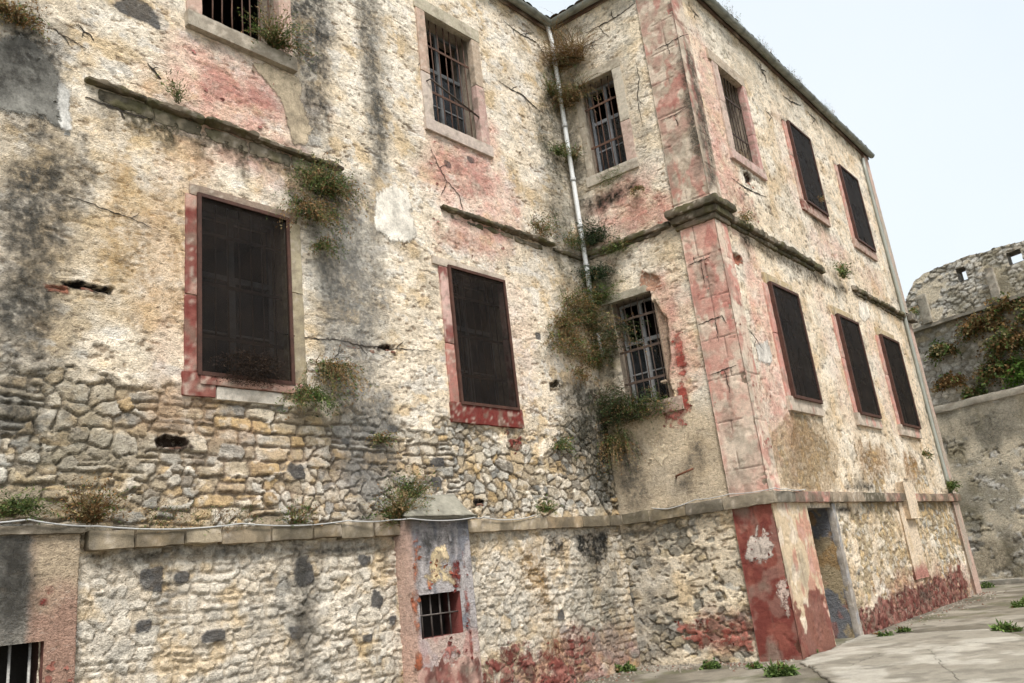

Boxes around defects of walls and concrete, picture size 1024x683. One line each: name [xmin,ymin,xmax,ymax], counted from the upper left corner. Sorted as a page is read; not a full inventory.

crack [499,81,545,114]
crack [431,150,463,208]
crack [61,194,157,229]
crack [294,335,431,357]
spalling [640,270,693,465]
peeling [743,525,774,563]
peeling [410,540,596,683]
peeling [776,579,792,618]
peeling [859,564,969,635]
peeling [674,613,754,652]